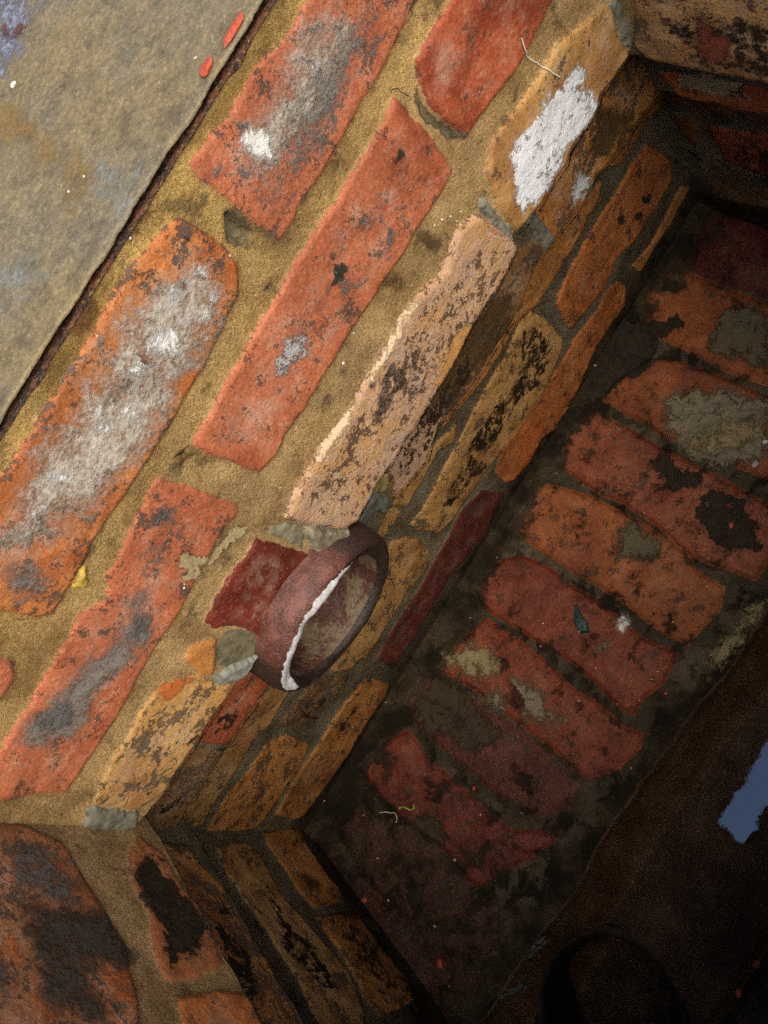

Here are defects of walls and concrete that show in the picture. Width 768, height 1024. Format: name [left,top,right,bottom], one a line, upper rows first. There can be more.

leakage [213,15,384,207]
leakage [13,266,219,542]
leakage [137,506,202,579]